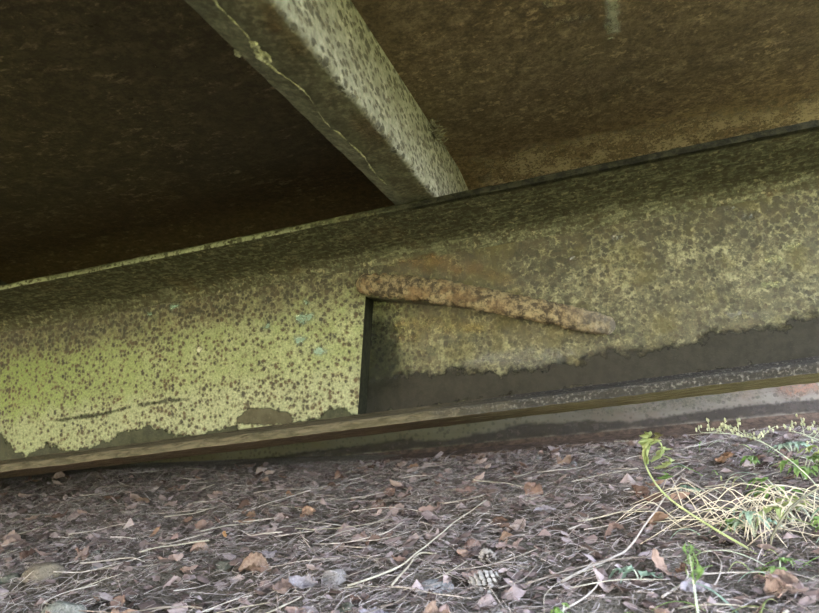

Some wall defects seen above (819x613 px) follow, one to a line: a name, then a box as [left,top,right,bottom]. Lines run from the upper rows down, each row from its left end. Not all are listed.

damp [605,0,619,39]
damp [366,310,819,413]